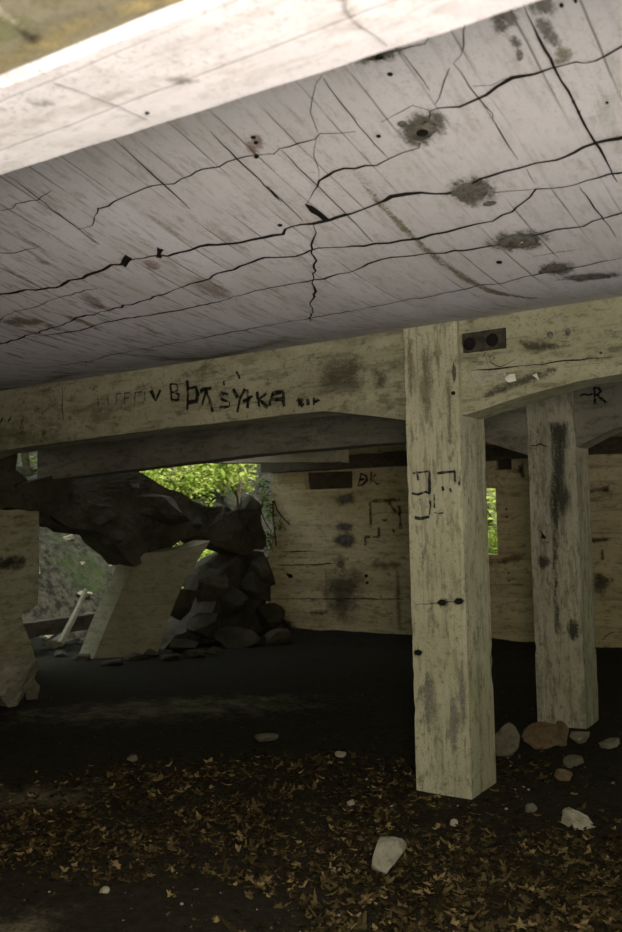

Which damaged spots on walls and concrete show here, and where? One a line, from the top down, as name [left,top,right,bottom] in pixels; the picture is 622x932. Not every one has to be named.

leakage [490,9,523,61]
leakage [529,0,571,64]
crack [0,0,622,368]
leakage [364,186,537,299]
crack [471,352,610,371]
leakage [538,423,581,640]